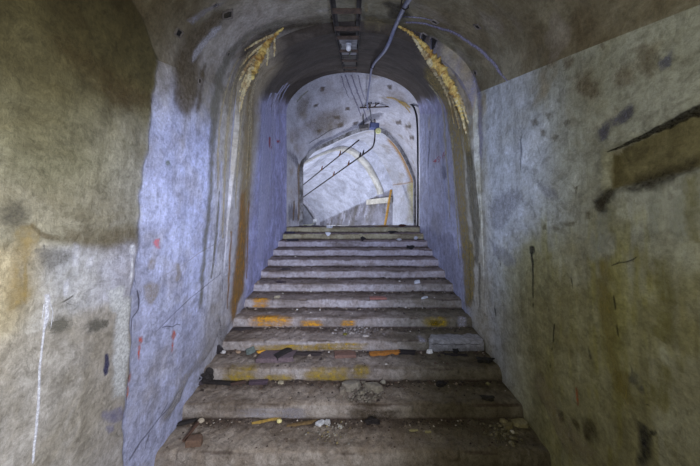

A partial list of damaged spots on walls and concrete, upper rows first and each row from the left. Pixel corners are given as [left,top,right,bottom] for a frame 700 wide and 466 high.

rust [227,88,253,319]
damp [199,22,302,308]
damp [308,75,367,152]
damp [388,3,507,274]
crack [607,105,700,152]
damp [32,295,53,463]